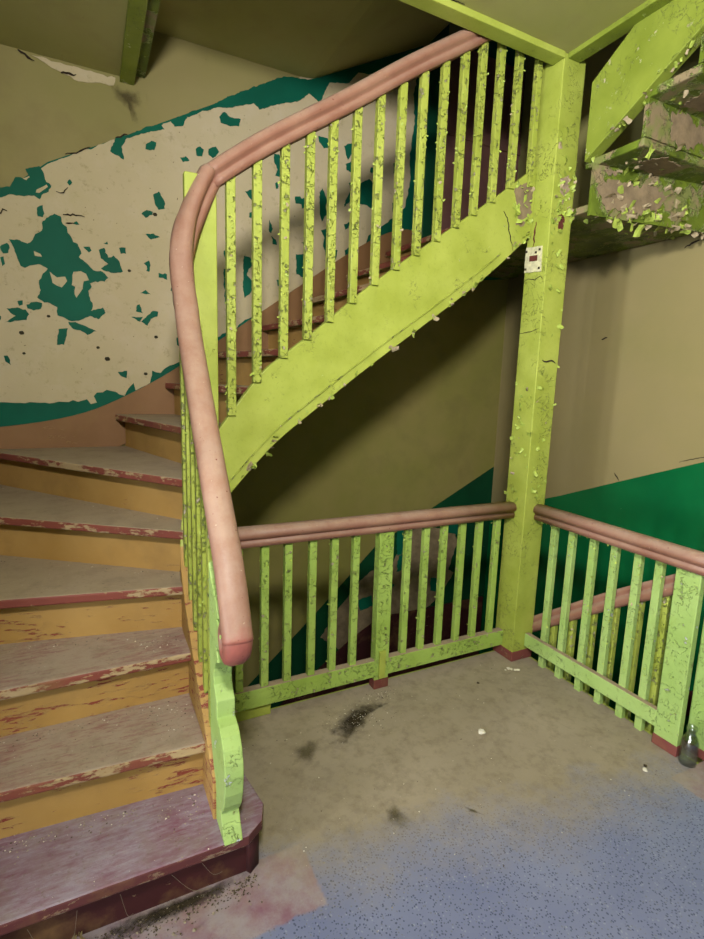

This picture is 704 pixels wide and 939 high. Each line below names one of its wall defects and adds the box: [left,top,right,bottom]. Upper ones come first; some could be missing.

peeling [657,27,704,74]
peeling [0,46,428,404]
peeling [473,132,535,259]
peeling [551,90,704,270]
peeling [510,382,547,499]